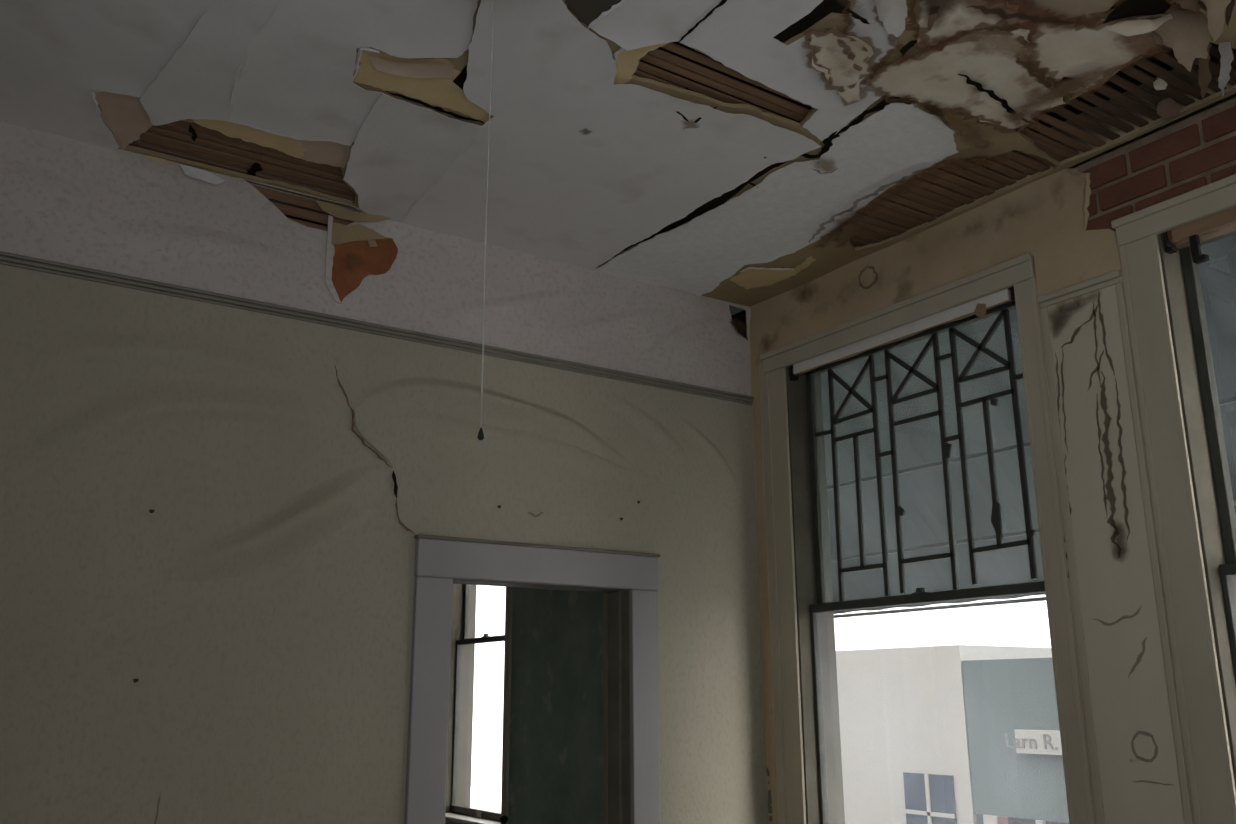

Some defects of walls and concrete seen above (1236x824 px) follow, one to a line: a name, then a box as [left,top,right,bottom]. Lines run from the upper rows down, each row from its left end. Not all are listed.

peeling [565,0,626,29]
peeling [874,0,917,56]
water stain [925,0,1074,58]
water stain [1122,33,1170,56]
peeling [90,90,153,149]
peeling [192,119,353,168]
peeling [353,47,489,124]
crack [675,106,718,123]
water stain [1008,71,1103,125]
flaking render [1063,0,1236,231]
water stain [809,101,1004,246]
spalling [325,215,398,304]